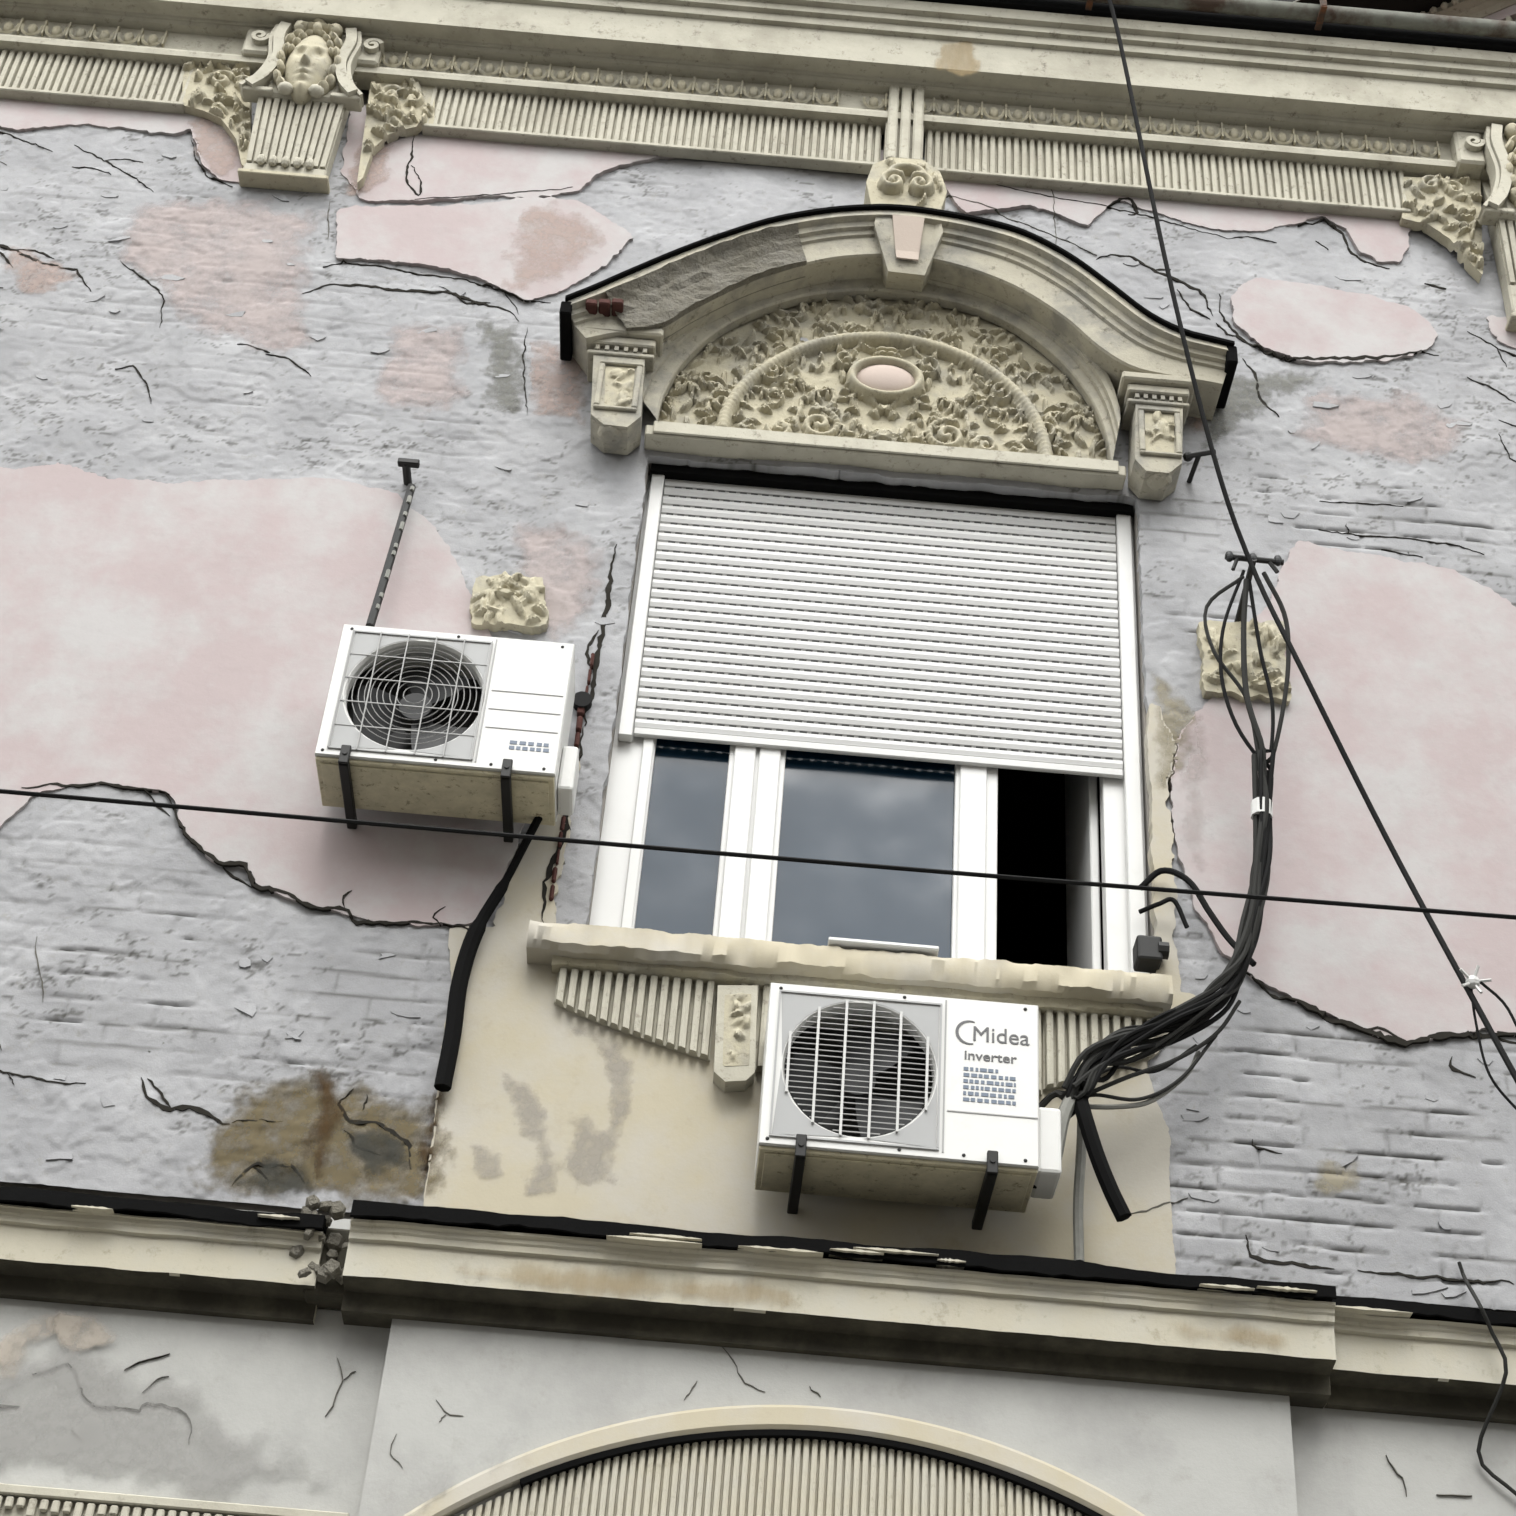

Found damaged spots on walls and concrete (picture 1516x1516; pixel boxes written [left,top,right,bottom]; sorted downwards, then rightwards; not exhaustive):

crack [0,131,150,189]
crack [405,138,570,200]
crack [0,244,91,291]
crack [120,260,165,325]
crack [237,343,311,376]
crack [302,203,551,411]
crack [946,184,1516,462]
flaking render [0,112,1516,927]
crack [1318,501,1484,558]
flaking render [0,785,451,1212]
damp [211,1073,442,1198]
flaking render [1147,842,1516,1311]